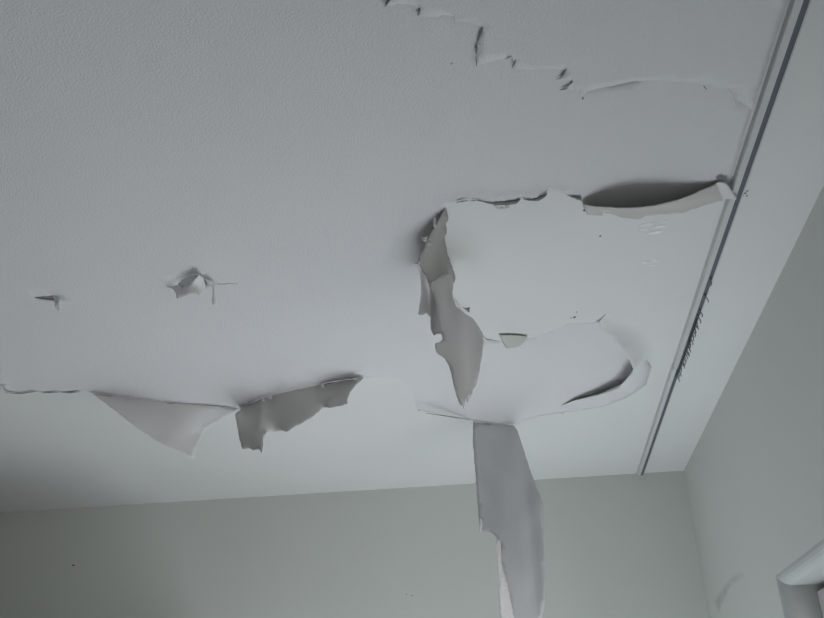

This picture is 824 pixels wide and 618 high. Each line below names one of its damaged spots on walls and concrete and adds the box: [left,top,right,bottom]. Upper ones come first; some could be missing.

peeling [0,0,752,459]
crack [5,389,107,397]
peeling [473,423,546,618]